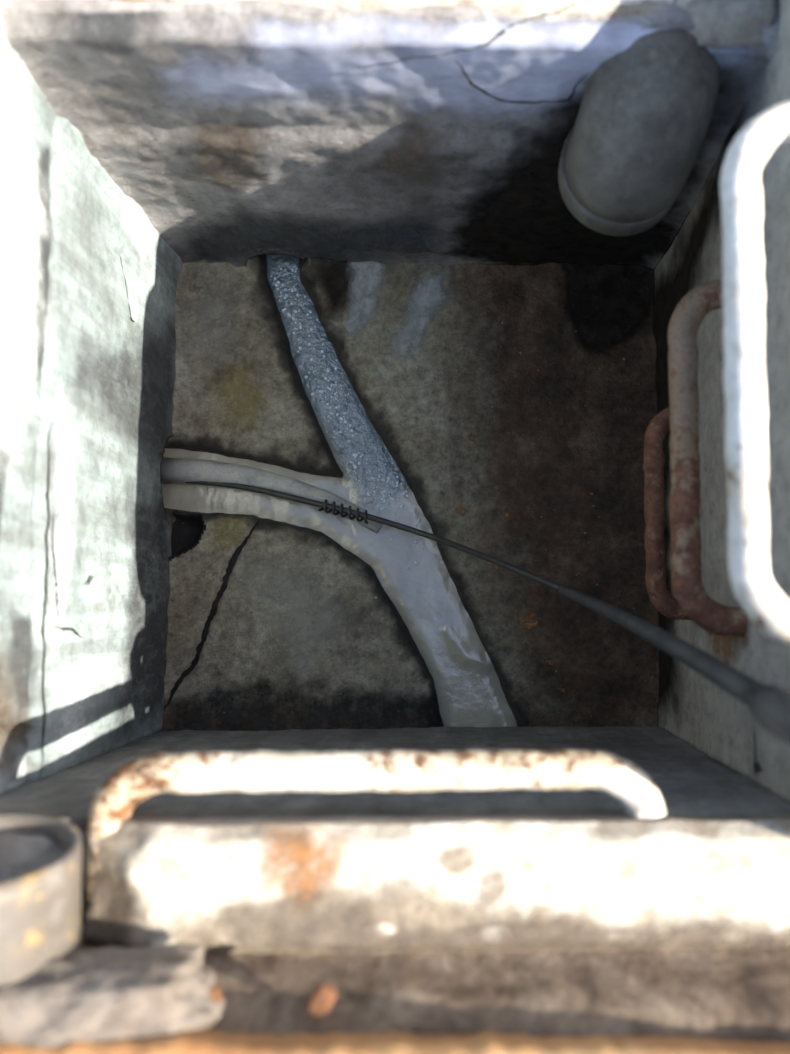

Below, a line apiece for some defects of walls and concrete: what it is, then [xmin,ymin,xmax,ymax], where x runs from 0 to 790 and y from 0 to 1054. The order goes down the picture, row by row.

crack [346,0,588,104]
water stain [450,93,735,414]
hole [168,510,206,563]
water stain [663,429,672,595]
crack [164,521,259,710]
water stain [658,611,673,634]
water stain [657,649,678,708]